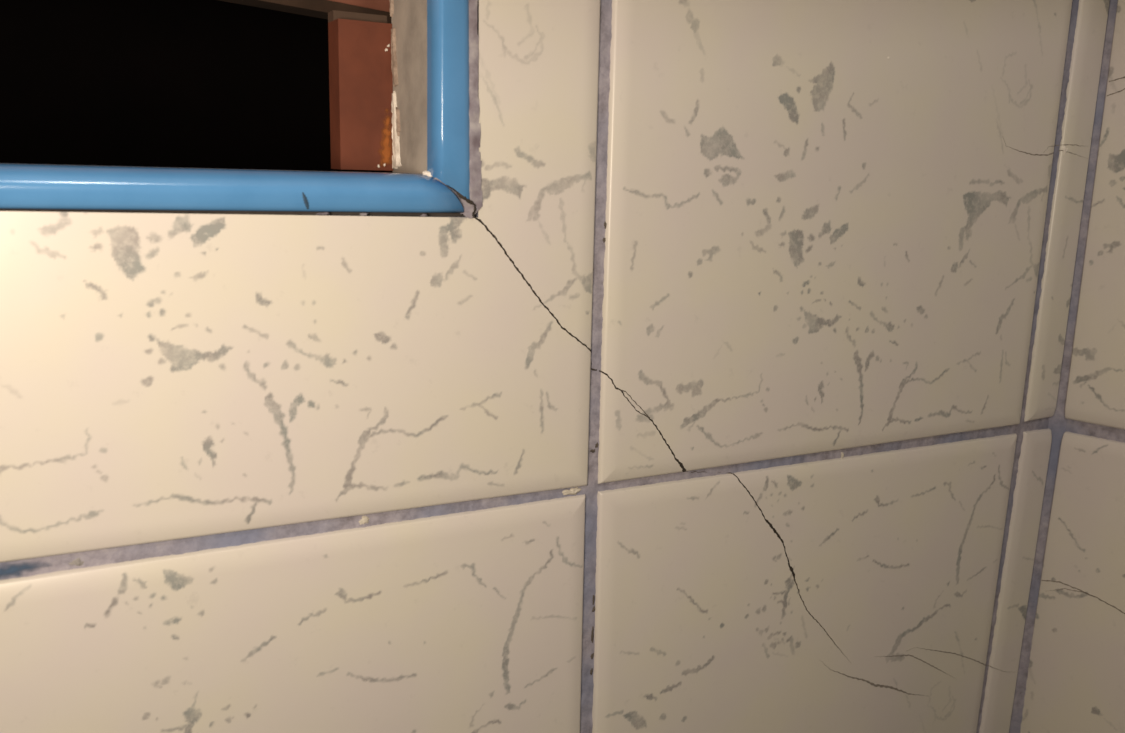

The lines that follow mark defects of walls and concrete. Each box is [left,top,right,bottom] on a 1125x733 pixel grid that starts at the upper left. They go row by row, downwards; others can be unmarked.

crack [447,185,1006,695]
crack [1042,580,1125,614]